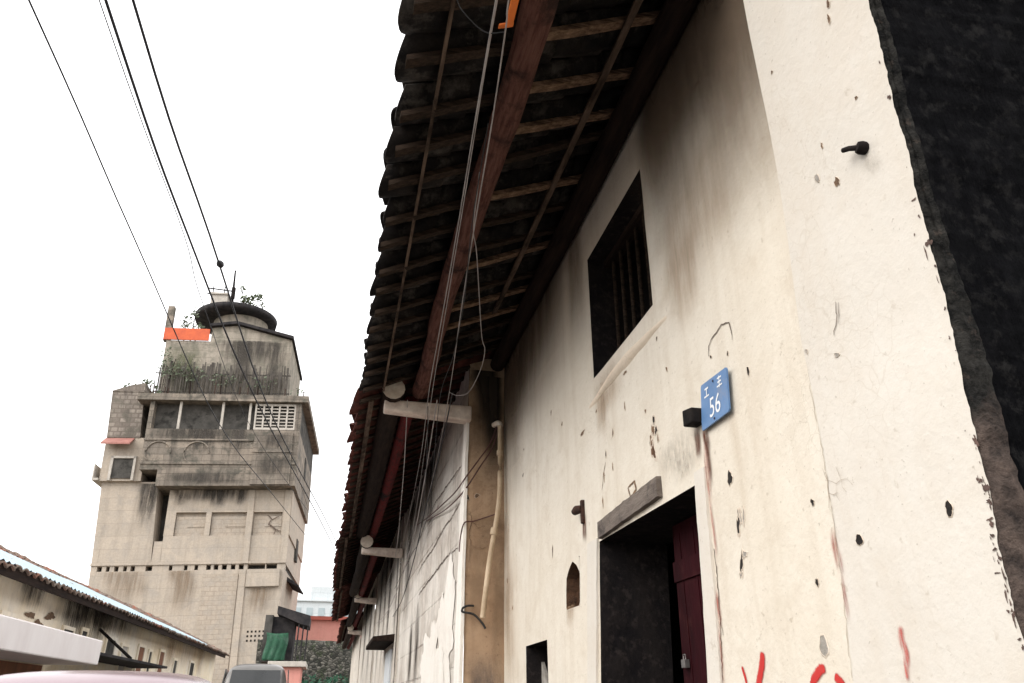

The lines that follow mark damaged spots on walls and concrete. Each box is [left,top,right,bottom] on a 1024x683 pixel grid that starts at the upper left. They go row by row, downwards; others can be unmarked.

flaking render [869,0,1024,650]
water stain [140,484,158,512]
water stain [175,473,245,502]
flaking render [644,409,659,462]
rust [695,430,711,491]
crack [808,374,852,676]